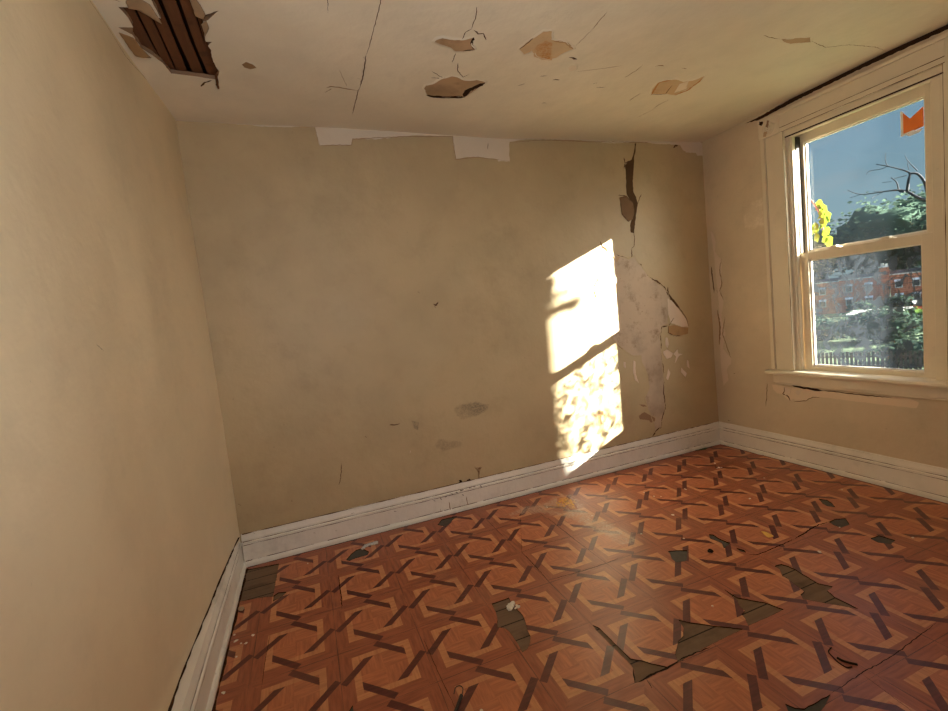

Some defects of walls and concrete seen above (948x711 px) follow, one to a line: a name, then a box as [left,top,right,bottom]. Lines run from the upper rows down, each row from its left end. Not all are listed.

spalling [118,0,219,79]
crack [326,0,381,111]
peeling [431,36,477,52]
peeling [422,75,488,98]
crack [594,143,678,437]
flaking render [602,250,689,433]